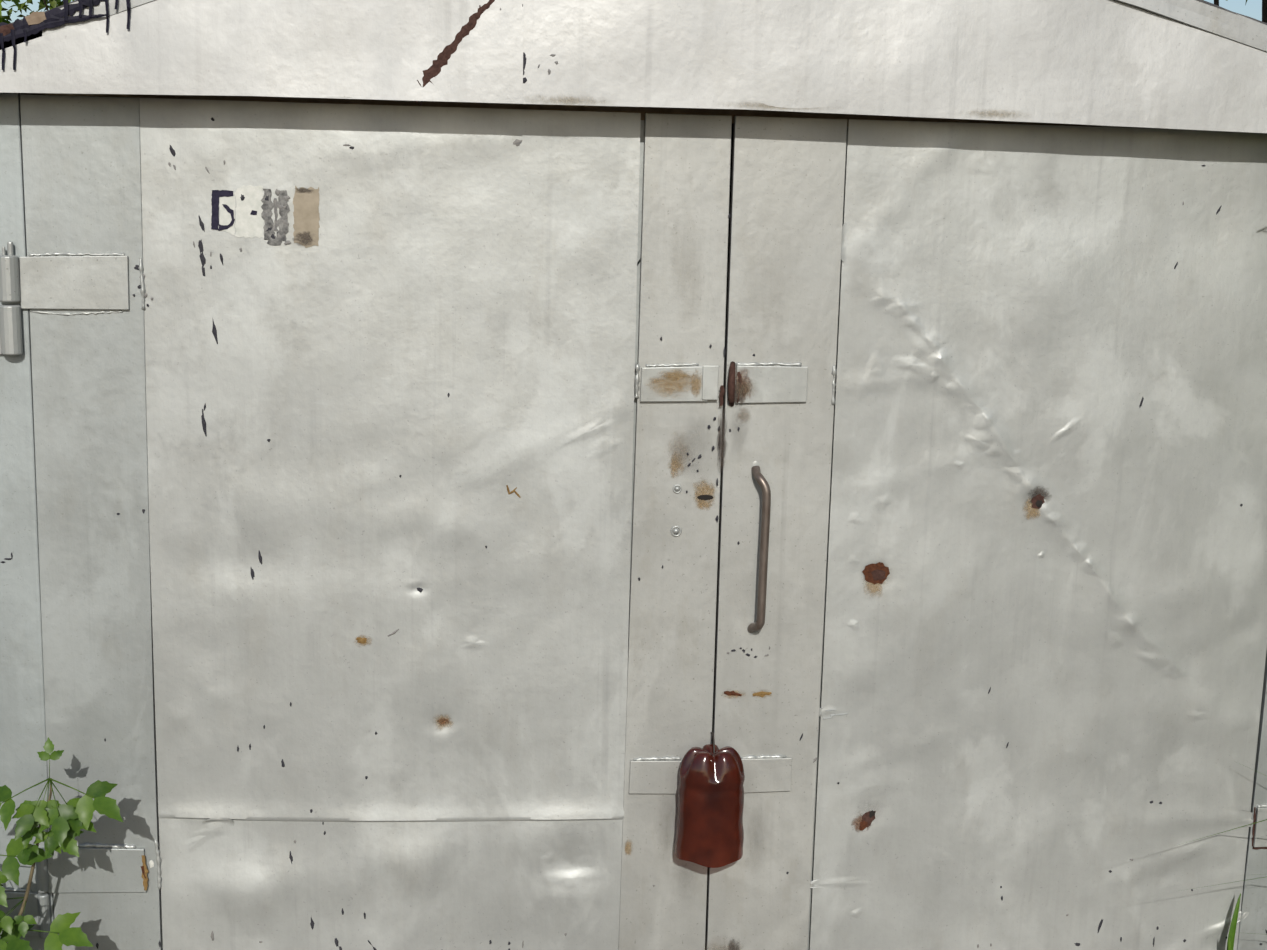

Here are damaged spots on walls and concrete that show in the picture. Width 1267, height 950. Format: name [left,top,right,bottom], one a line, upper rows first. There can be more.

rust [653,371,701,393]
rust [718,372,750,468]